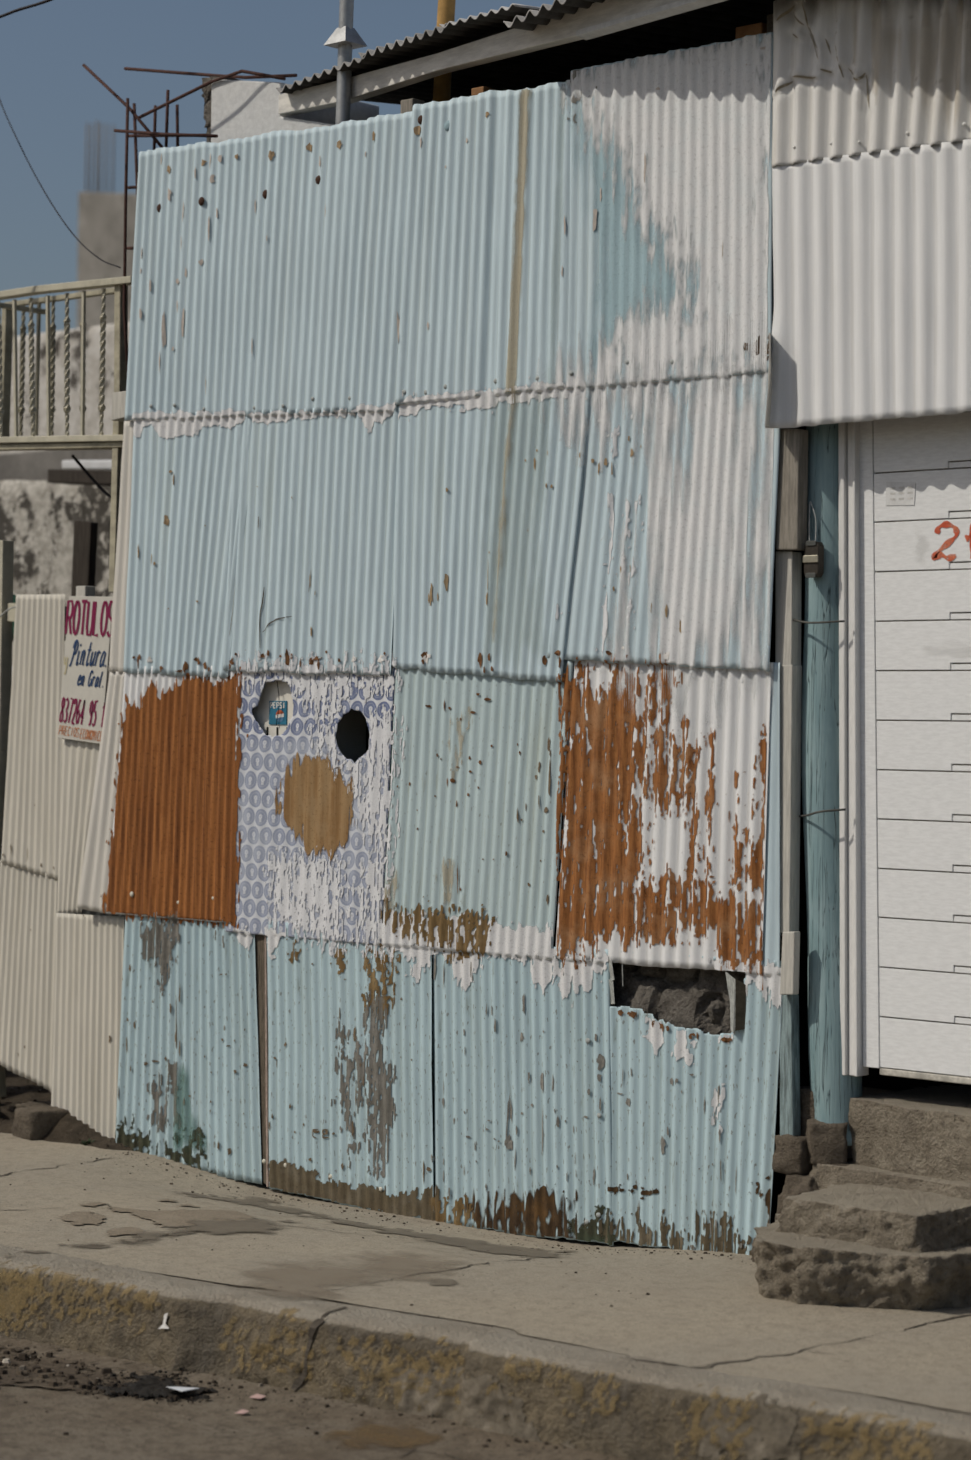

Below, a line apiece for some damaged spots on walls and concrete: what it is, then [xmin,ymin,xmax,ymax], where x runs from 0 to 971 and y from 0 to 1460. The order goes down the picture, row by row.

peeling [132,33,774,722]
corrosion [101,653,248,929]
corrosion [275,752,355,865]
peeling [215,628,608,1012]
corrosion [542,650,766,990]
corrosion [330,859,495,1020]
peeling [109,1017,195,1132]
peeling [269,989,450,1221]
peeling [464,1034,632,1175]
corrosion [428,1184,752,1255]
crack [280,1225,531,1391]
crack [624,1314,971,1368]